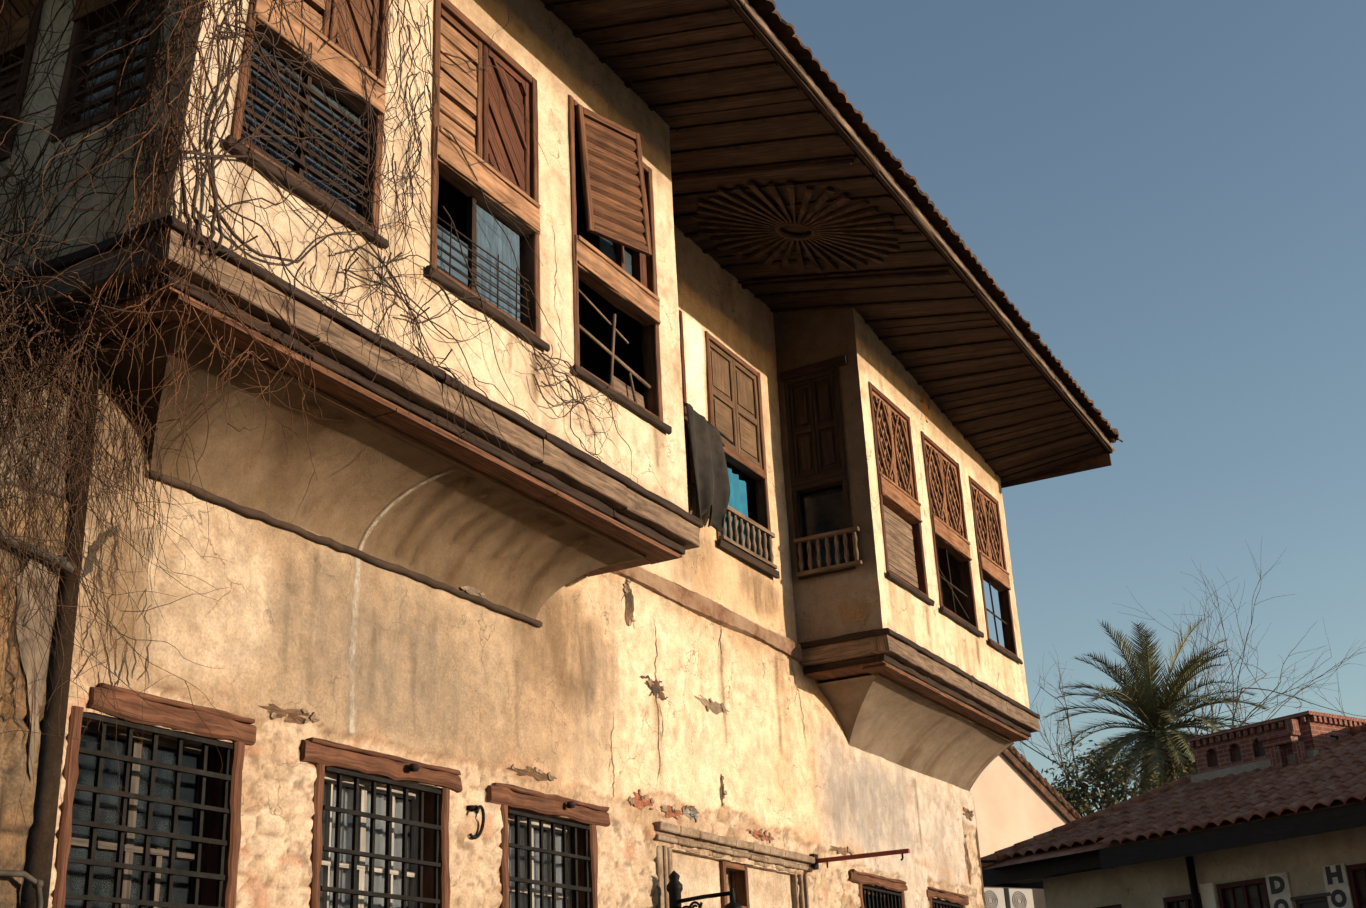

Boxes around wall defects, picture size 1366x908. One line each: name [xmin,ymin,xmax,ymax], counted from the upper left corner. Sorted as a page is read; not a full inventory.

flaking render [645,679,665,699]
peeling [260,703,321,724]
peeling [694,695,729,715]
peeling [507,764,557,781]
flaking render [627,789,699,823]